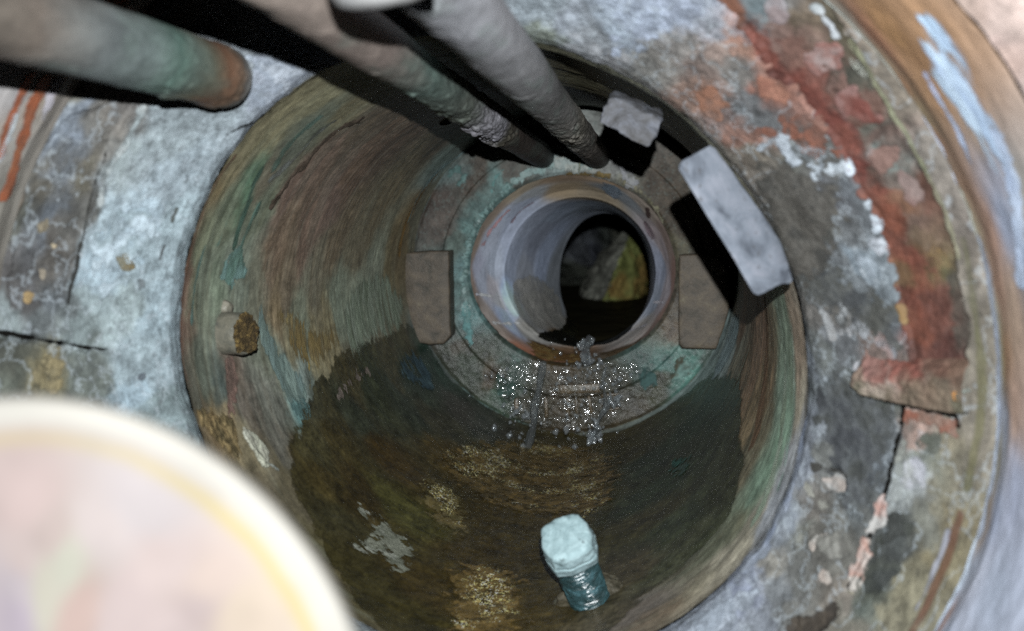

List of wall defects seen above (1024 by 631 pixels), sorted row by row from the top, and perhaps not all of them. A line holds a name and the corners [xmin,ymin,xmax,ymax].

corrosion [103,0,129,8]
corrosion [0,73,52,202]
corrosion [752,74,841,162]
leakage [756,133,907,360]
crack [0,330,107,351]
leakage [688,300,942,631]
crack [861,395,959,500]
peeling [844,494,887,594]